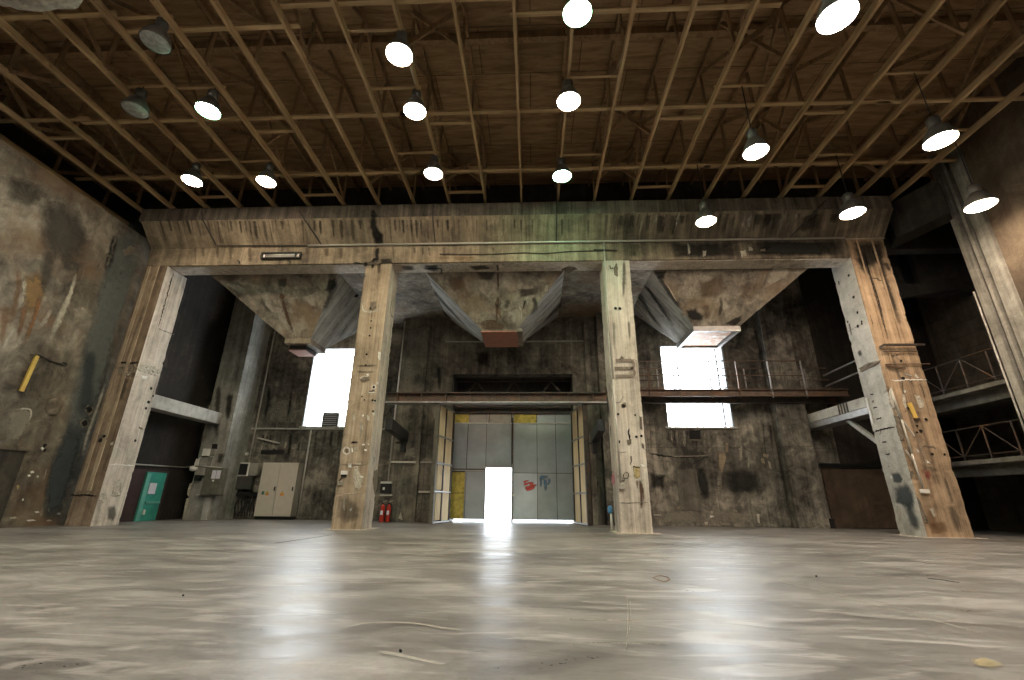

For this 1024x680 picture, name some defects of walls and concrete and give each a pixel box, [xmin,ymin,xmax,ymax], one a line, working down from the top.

corrosion [2,275,44,337]
leakage [897,505,918,528]